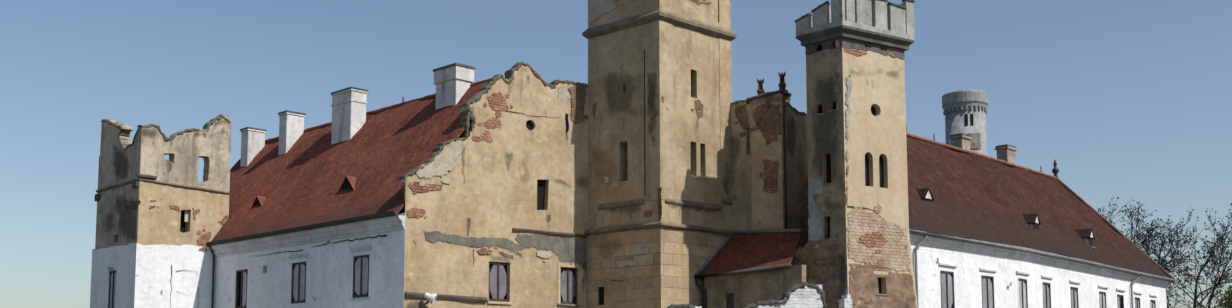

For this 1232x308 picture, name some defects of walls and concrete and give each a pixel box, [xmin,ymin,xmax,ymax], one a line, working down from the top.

flaking render [844,48,867,57]
flaking render [691,99,704,119]
flaking render [730,100,806,145]
flaking render [396,62,588,269]
flaking render [644,187,662,221]
flaking render [742,74,917,308]